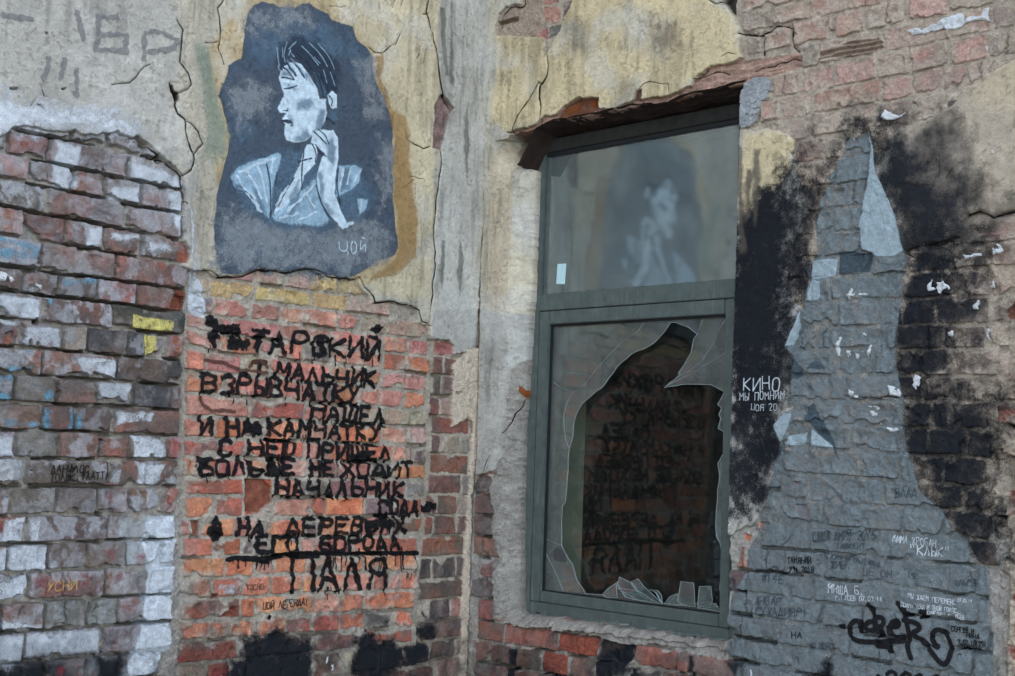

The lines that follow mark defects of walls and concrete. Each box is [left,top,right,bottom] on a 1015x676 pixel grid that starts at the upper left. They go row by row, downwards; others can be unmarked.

spalling [496,0,543,37]
peeling [908,7,990,35]
spalling [819,37,886,59]
crack [512,59,549,132]
peeling [881,109,905,120]
spalling [172,241,191,264]
spalling [165,293,185,311]